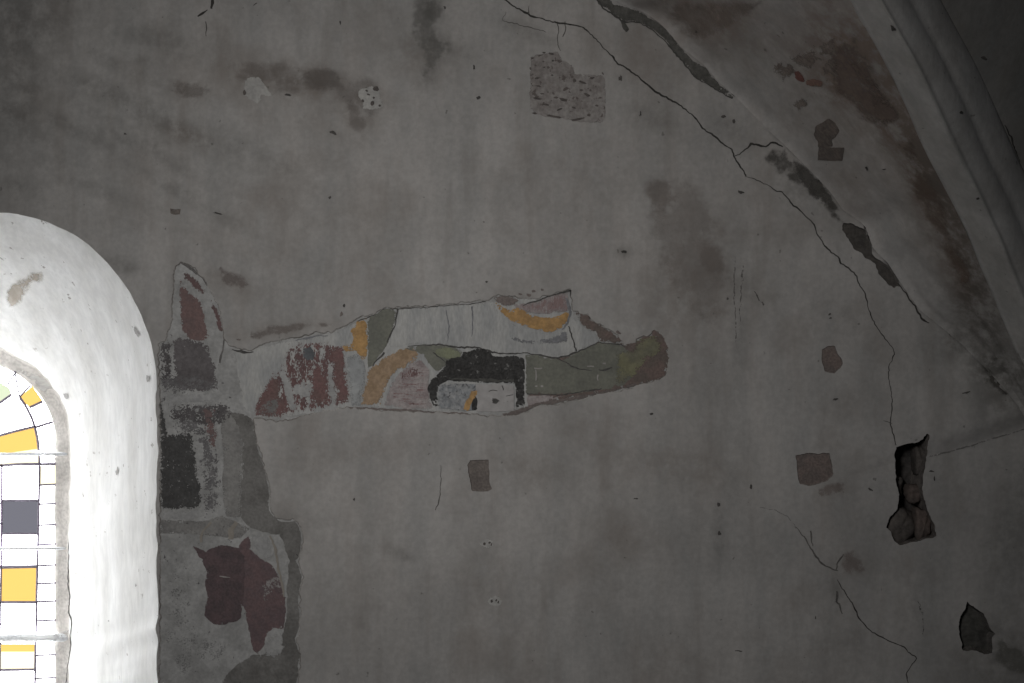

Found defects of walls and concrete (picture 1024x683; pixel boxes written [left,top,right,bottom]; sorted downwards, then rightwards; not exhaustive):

spalling [597,0,734,99]
spalling [814,119,844,161]
water stain [797,164,837,209]
crack [502,0,896,445]
spalling [842,223,900,288]
crack [897,283,950,335]
spalling [822,346,843,373]
peeling [146,262,669,683]
spalling [796,453,834,486]
spalling [886,434,936,545]
crack [760,507,924,682]
spalling [959,602,995,654]